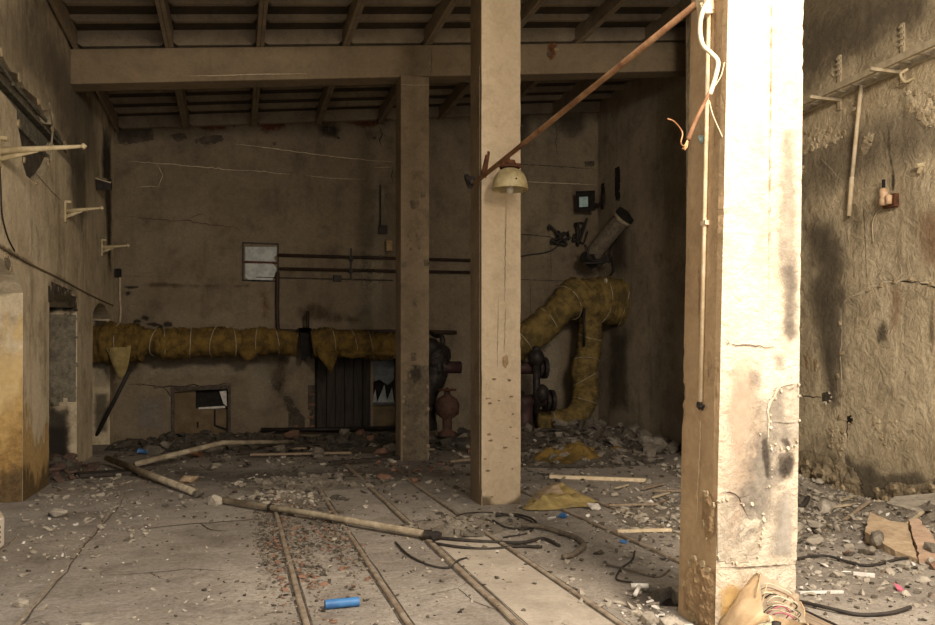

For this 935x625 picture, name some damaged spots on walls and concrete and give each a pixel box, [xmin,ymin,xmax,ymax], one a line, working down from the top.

flaking render [0,47,67,185]
flaking render [901,84,935,135]
peeling [48,282,78,406]
water stain [814,280,839,398]
water stain [0,356,67,503]
water stain [781,458,794,474]